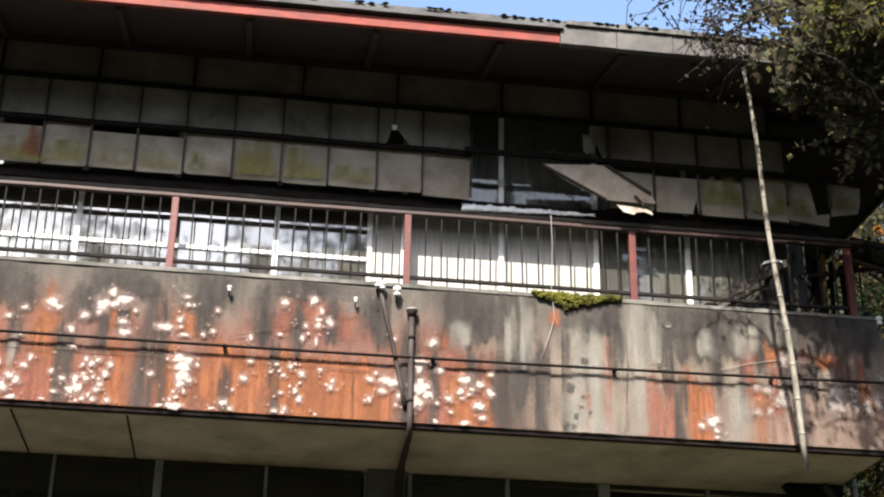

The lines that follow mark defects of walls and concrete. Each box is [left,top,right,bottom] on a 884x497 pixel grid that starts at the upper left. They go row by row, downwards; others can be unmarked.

corrosion [0,289,55,401]
peeling [39,351,117,403]
peeling [68,283,138,337]
peeling [150,347,199,410]
peeling [207,291,334,414]
corrosion [198,341,390,421]
damp [429,353,438,424]
damp [442,291,549,430]
damp [562,300,643,433]
corrosion [687,374,717,440]
damp [650,307,765,438]
corrosion [724,340,884,450]